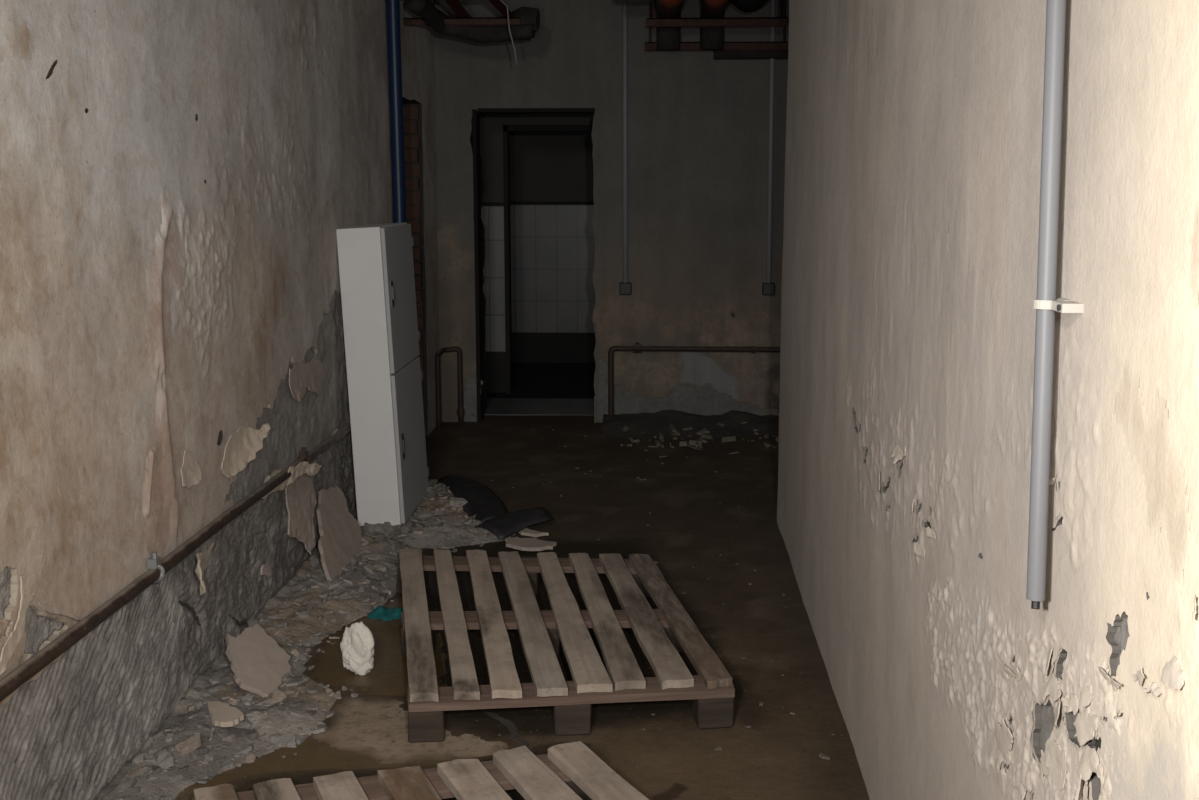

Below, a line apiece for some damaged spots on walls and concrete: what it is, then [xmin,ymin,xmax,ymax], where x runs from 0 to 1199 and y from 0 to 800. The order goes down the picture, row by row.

leakage [4,0,35,68]
leakage [42,62,96,246]
leakage [0,381,98,587]
spalling [0,292,357,800]
spalling [594,352,777,423]
peeling [923,573,1184,800]